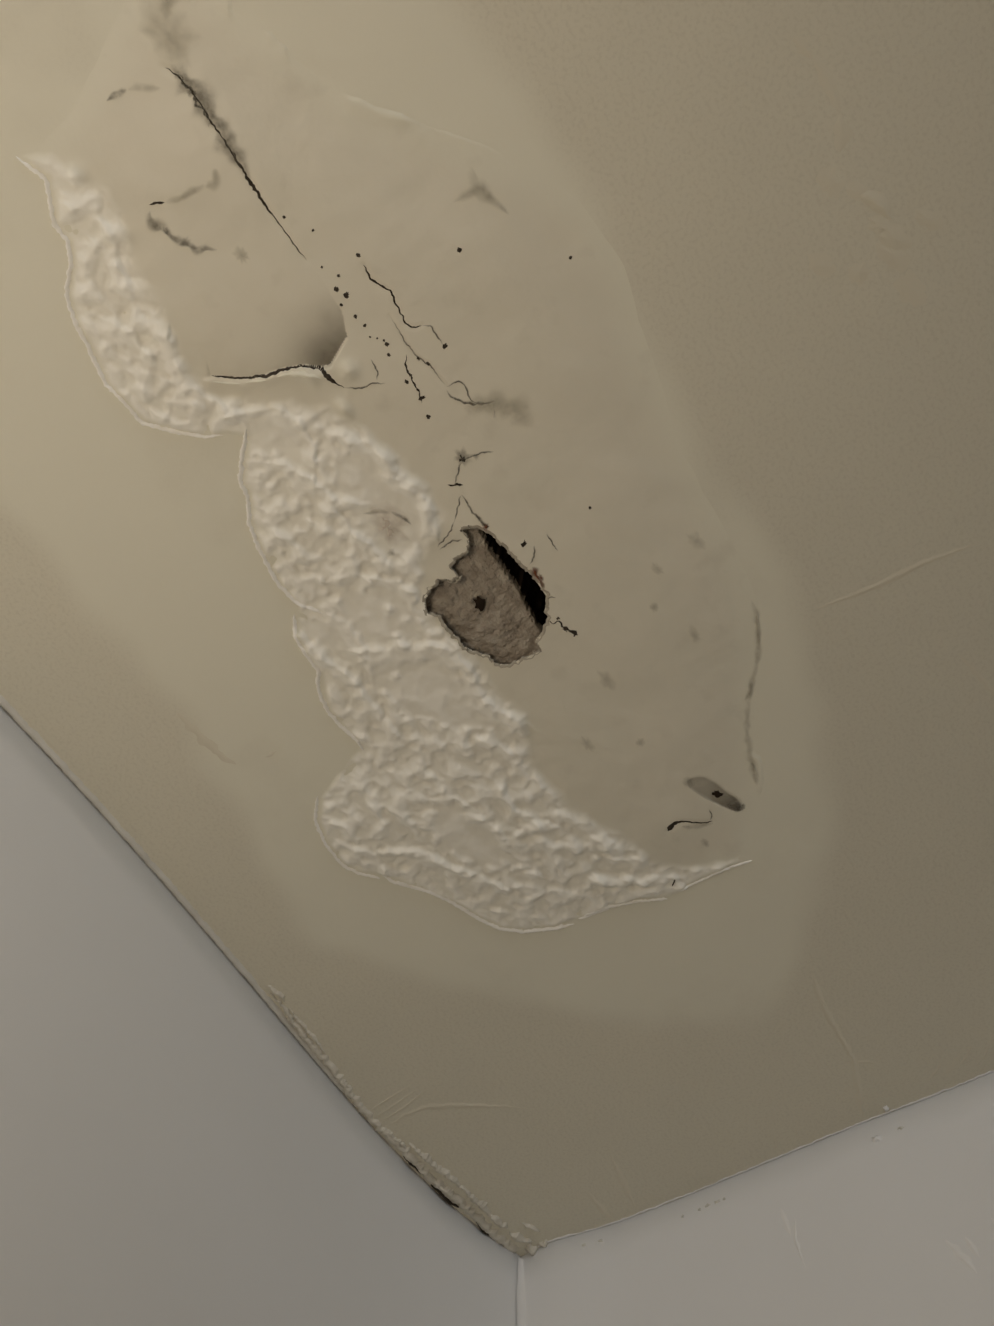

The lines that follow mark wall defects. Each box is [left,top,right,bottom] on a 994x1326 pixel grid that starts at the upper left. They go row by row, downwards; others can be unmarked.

crack [166,68,306,259]
crack [210,253,488,419]
flaking render [16,156,752,934]
flaking render [268,985,548,1256]